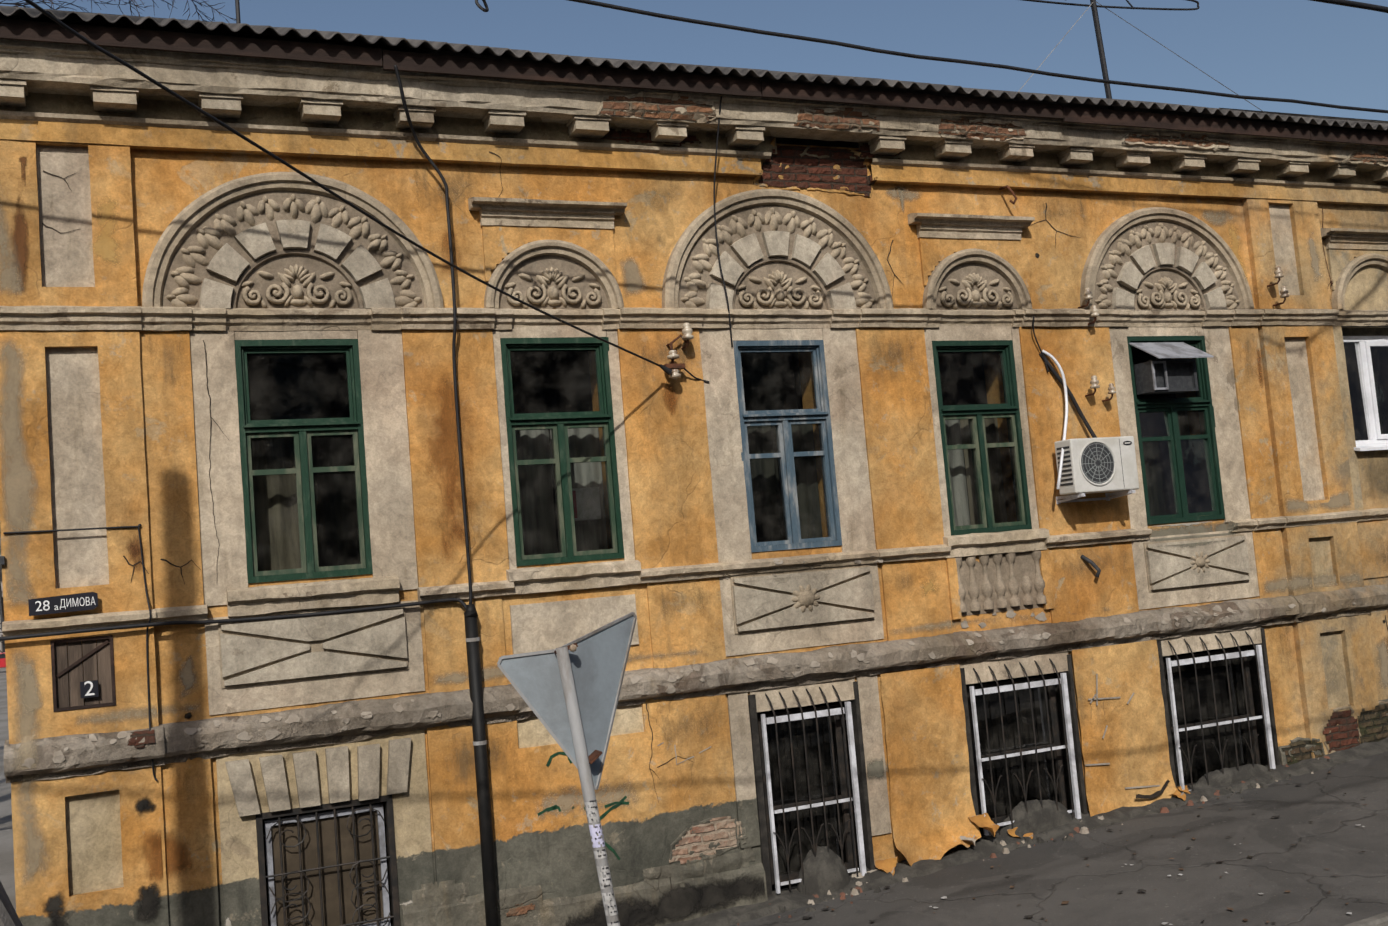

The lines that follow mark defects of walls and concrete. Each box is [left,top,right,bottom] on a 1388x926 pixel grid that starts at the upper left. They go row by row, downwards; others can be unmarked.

flaking render [596,91,716,147]
flaking render [753,106,903,198]
crack [123,340,229,584]
peeling [961,610,1051,645]
peeling [743,641,1033,878]
flaking render [1281,701,1388,765]
flaking render [669,816,748,866]